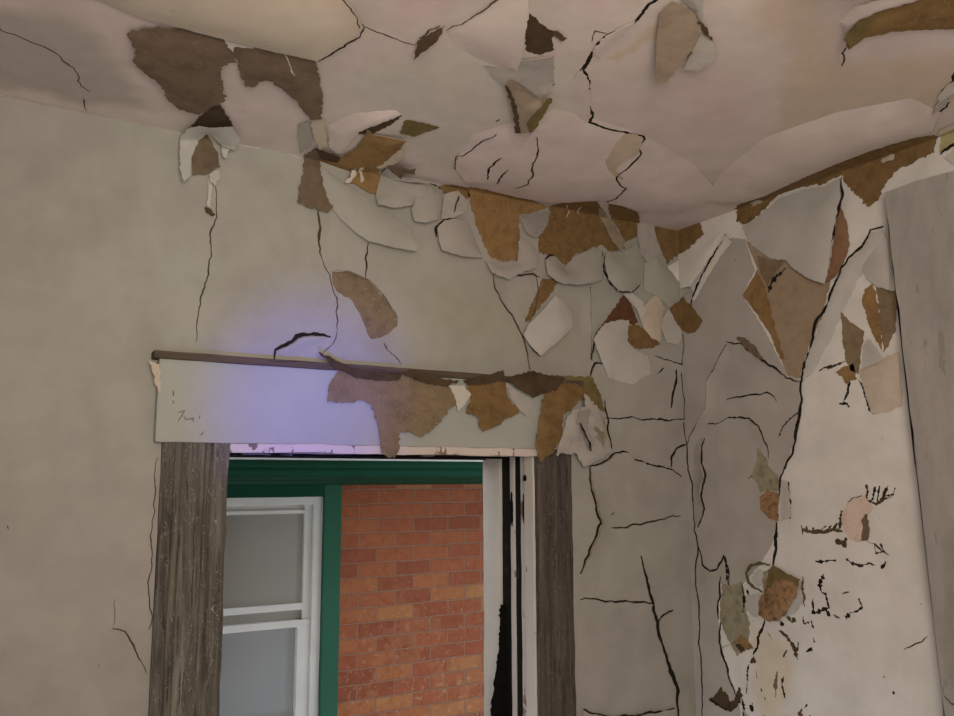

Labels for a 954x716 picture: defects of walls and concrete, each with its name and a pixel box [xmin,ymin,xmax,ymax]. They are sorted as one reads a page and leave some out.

crack [0,29,136,123]
peeling [126,27,439,258]
crack [566,0,658,202]
peeling [149,360,161,392]
crack [196,186,217,341]
crack [274,259,339,359]
peeling [332,243,398,339]
peeling [319,352,605,462]
peeling [414,0,954,716]
crack [580,177,885,716]